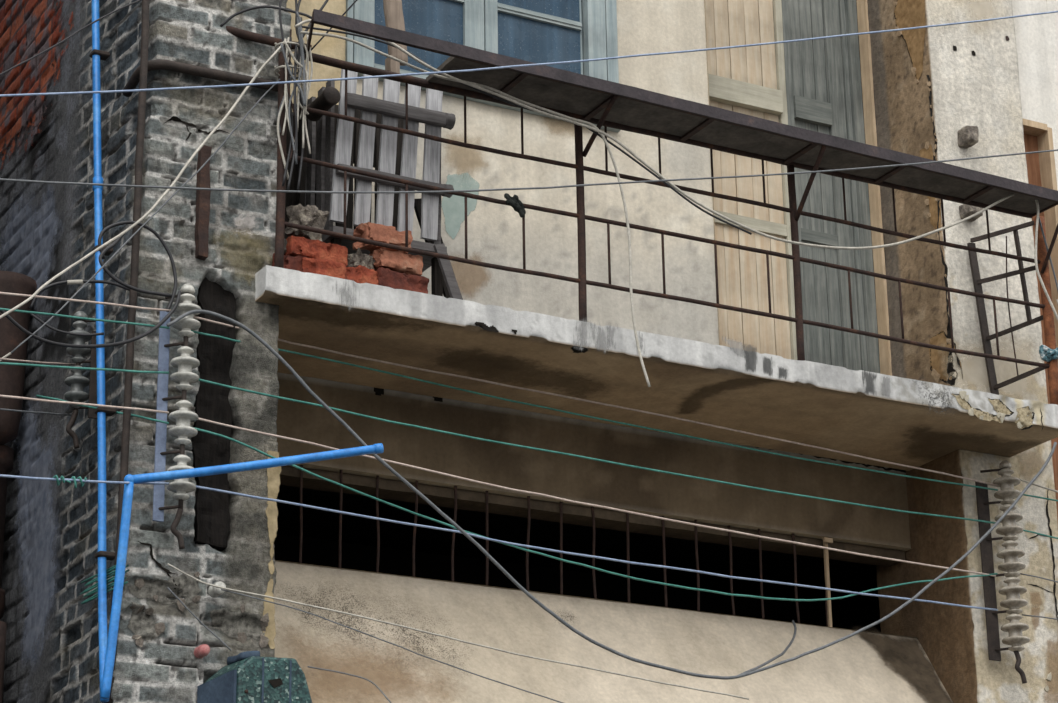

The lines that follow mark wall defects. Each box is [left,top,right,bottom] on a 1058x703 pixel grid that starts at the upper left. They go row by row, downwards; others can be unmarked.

peeling [0,0,74,178]
crack [165,116,230,142]
peeling [442,173,480,239]
spalling [924,196,1035,430]